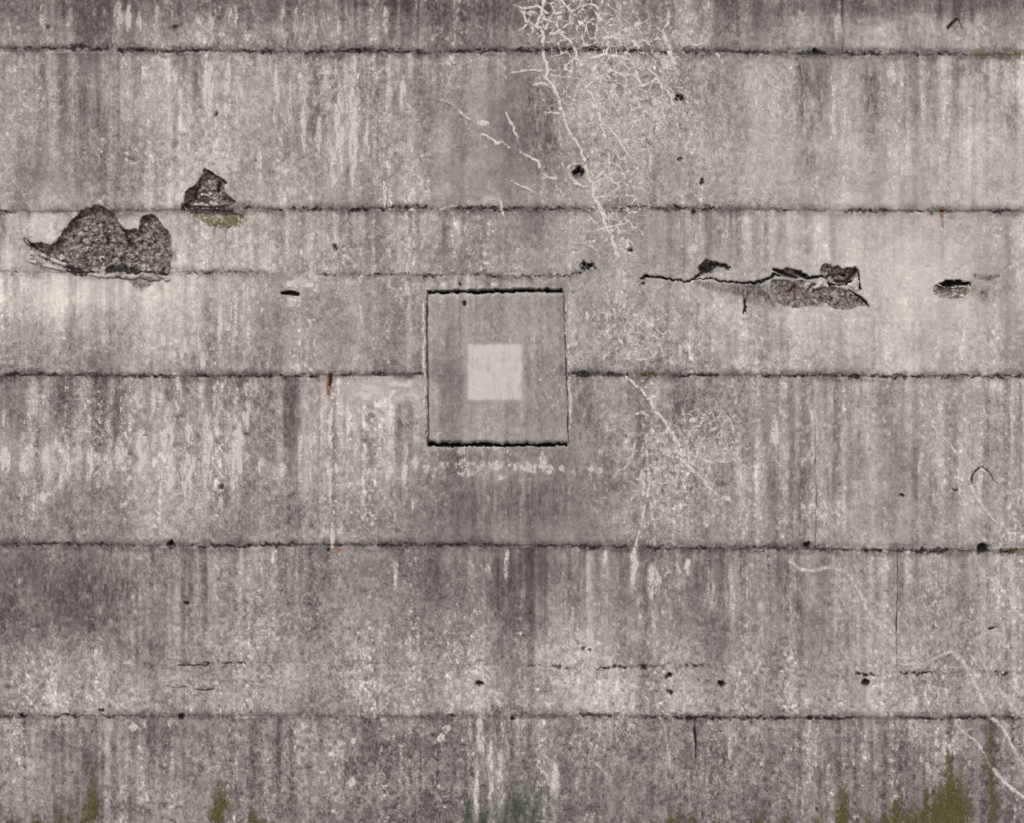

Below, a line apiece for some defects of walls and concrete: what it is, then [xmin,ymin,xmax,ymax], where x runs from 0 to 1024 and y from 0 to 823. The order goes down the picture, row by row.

crack [11,44,213,55]
water stain [154,52,240,160]
water stain [272,58,371,198]
spalling [23,204,173,287]
spalling [181,168,244,229]
spalling [933,274,996,299]
water stain [0,273,253,511]
crack [6,372,422,380]
crack [232,0,1024,799]
water stain [257,401,603,510]
crack [191,541,462,551]
water stain [630,547,662,660]